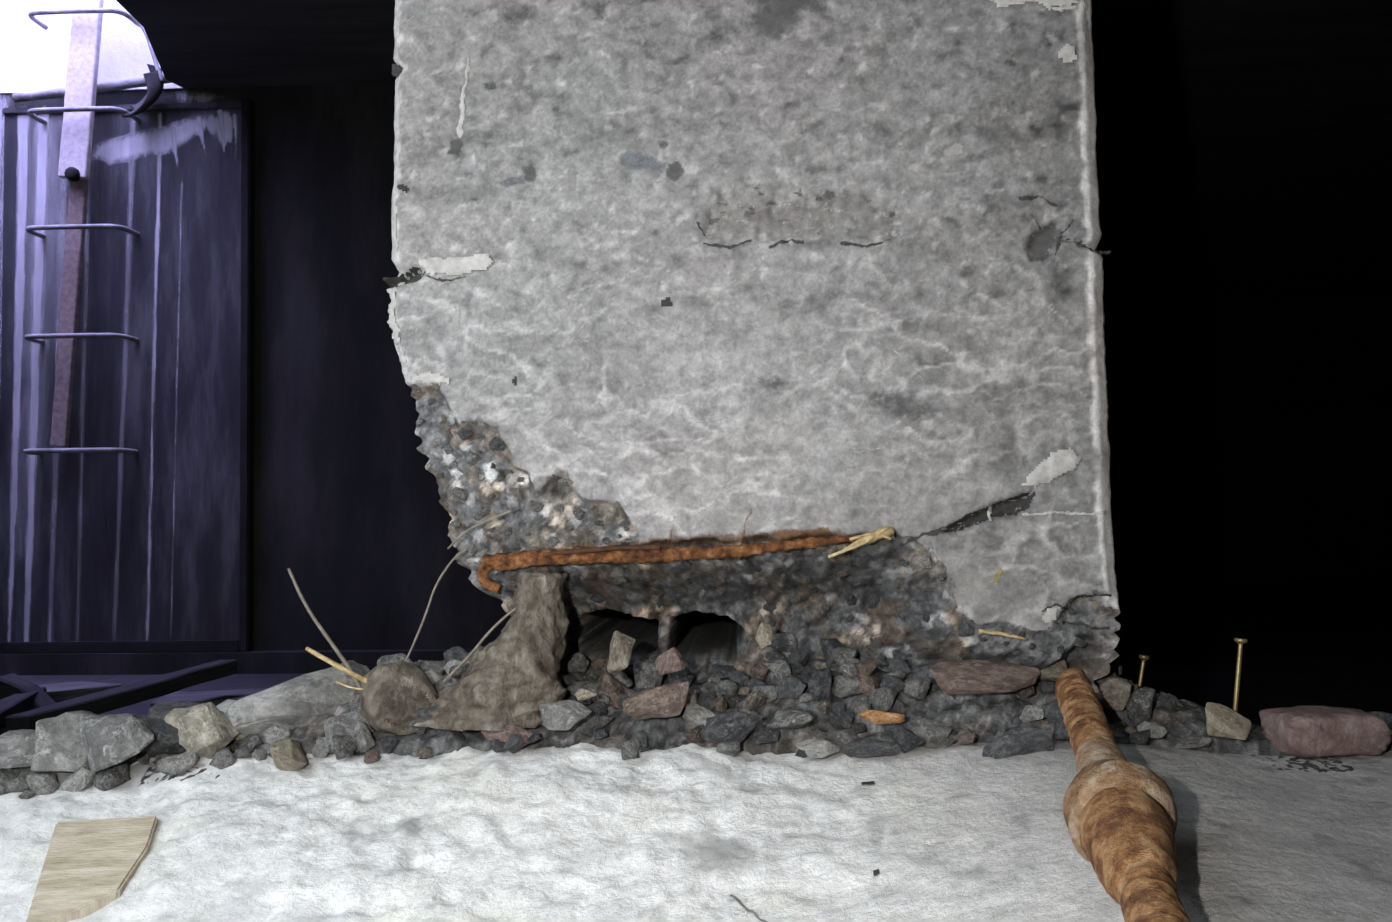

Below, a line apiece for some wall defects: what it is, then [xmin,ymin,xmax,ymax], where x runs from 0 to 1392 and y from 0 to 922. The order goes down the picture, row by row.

corrosion [542,513,840,557]
spalling [383,254,1120,694]